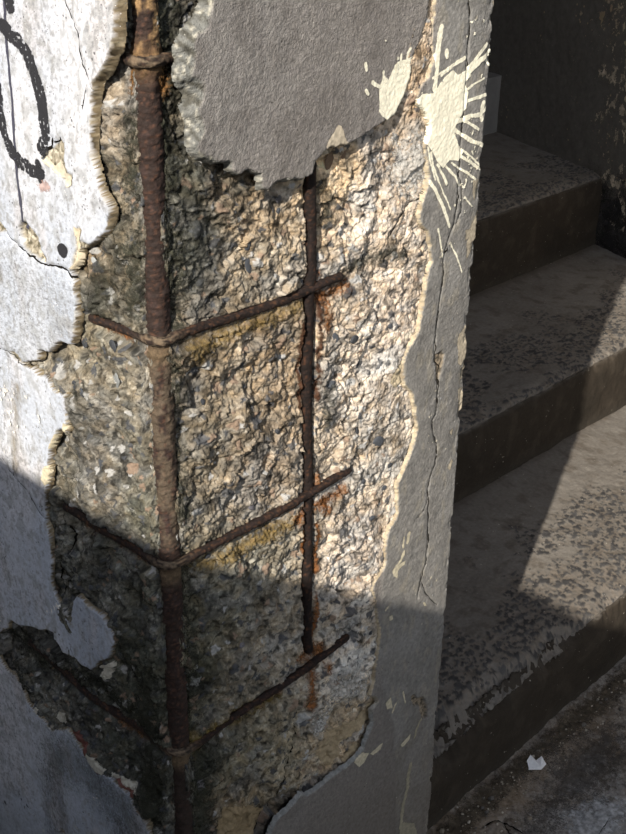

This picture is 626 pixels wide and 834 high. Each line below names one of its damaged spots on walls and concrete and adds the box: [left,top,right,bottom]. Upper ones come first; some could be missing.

crack [463,0,471,85]
peeling [454,130,479,213]
peeling [580,0,626,232]
crack [8,234,79,278]
peeling [465,210,478,259]
spalling [0,0,433,834]
corrosion [294,279,350,409]
crack [417,111,464,605]
peeling [452,313,467,411]
corrosion [296,594,334,712]